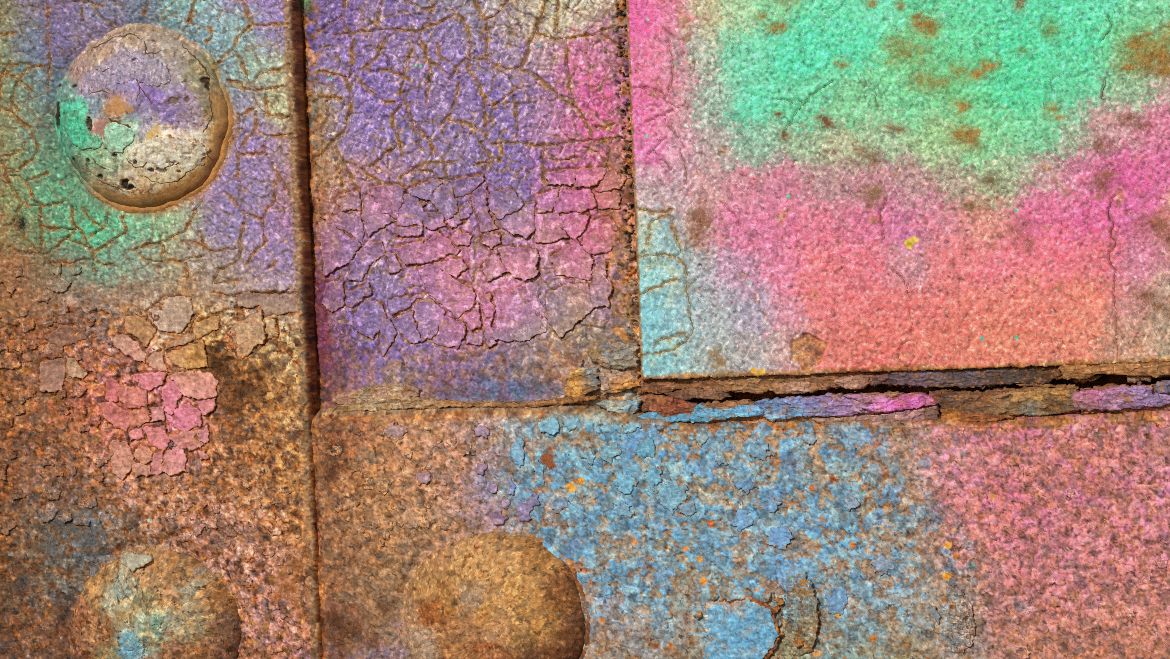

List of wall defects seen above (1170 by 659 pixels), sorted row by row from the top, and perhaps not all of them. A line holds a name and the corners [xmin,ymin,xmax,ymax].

crack [314,0,622,186]
corrosion [1121,24,1170,75]
crack [0,0,293,362]
corrosion [0,263,97,373]
peeling [39,324,88,393]
corrosion [37,385,114,553]
peeling [98,291,299,480]
corrosion [160,478,303,620]
corrosion [322,429,464,546]
peeling [331,341,1170,532]
peeling [765,526,794,550]
peeling [825,586,848,616]